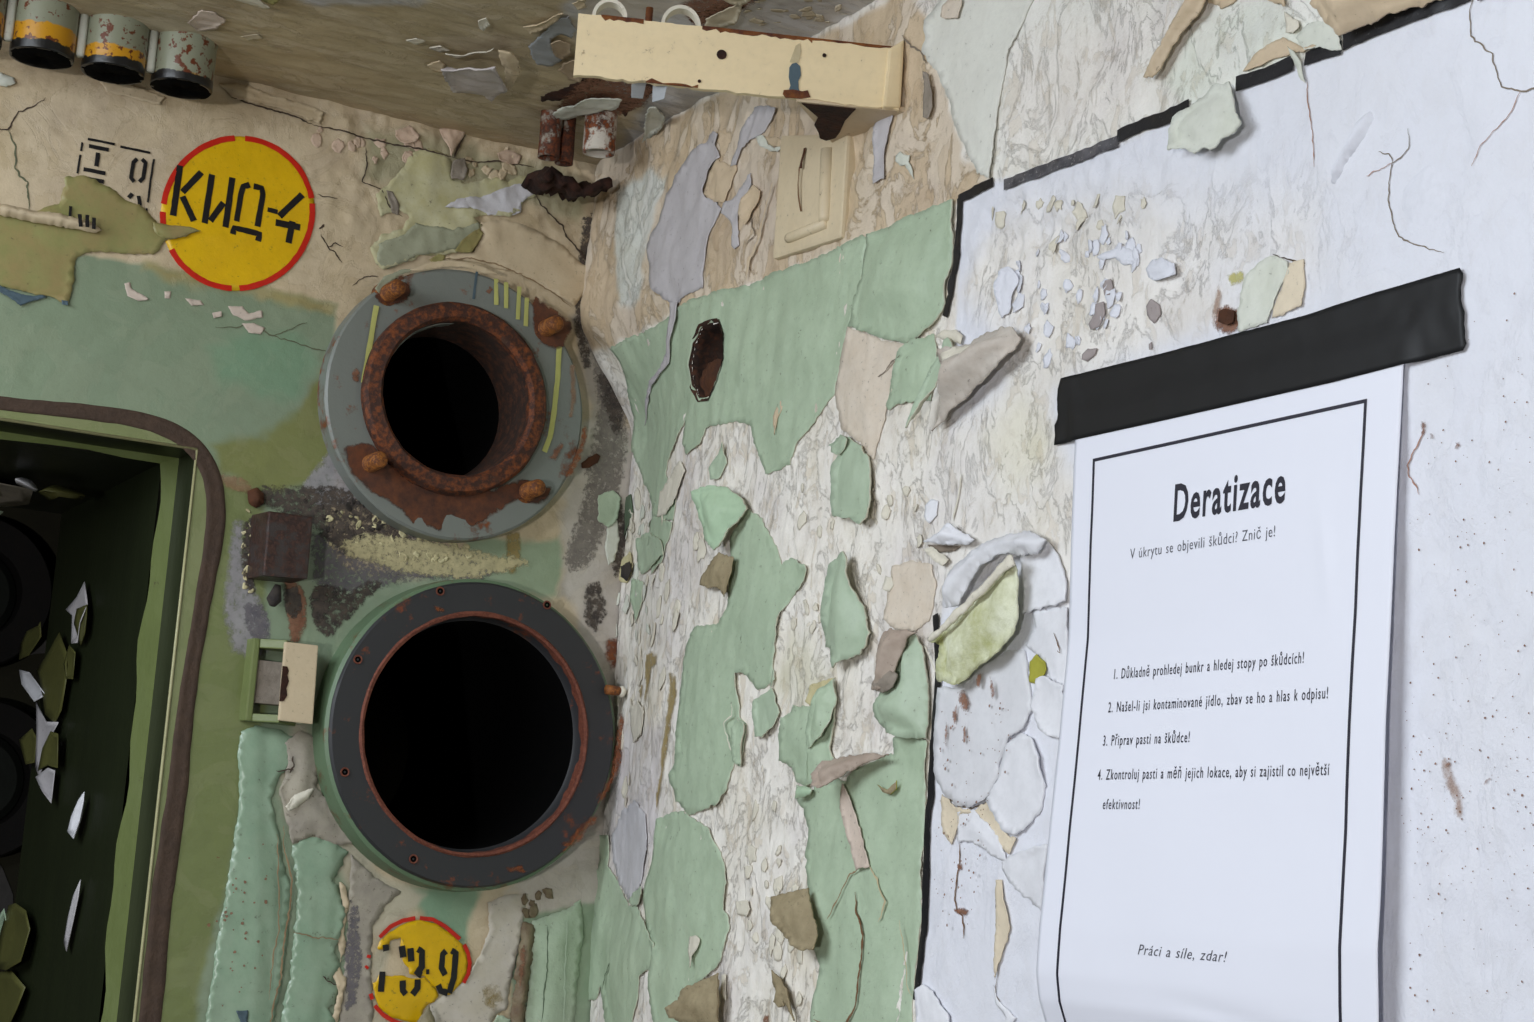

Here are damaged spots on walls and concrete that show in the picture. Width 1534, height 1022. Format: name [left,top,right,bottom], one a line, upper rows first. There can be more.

peeling [406,0,586,103]
peeling [1143,0,1236,78]
peeling [1167,0,1443,154]
crack [0,97,46,208]
peeling [0,175,199,306]
rust [375,275,411,306]
rust [532,297,572,348]
rust [550,366,601,477]
rust [344,443,551,531]
peeling [417,105,1176,1022]
peeling [206,725,401,1022]